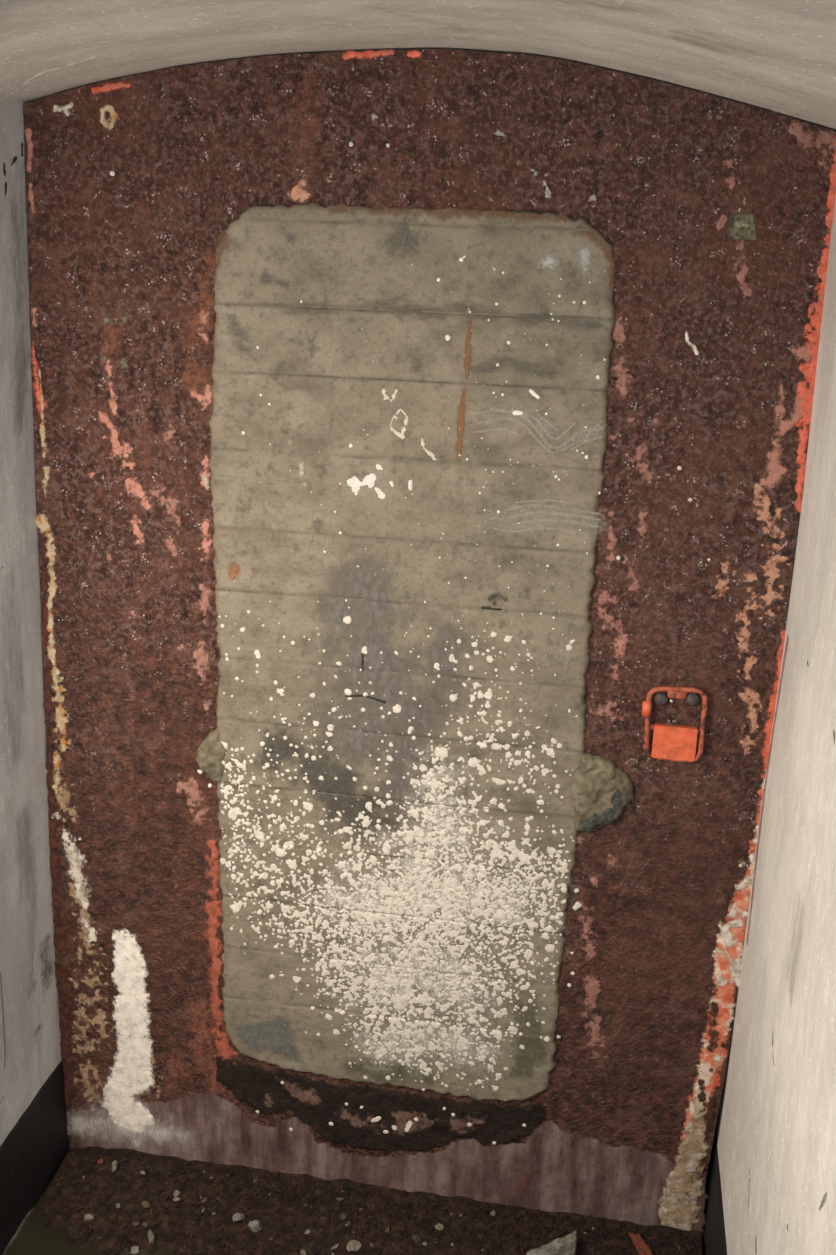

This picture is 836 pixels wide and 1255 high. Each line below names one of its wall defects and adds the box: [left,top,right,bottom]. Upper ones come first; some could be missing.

peeling [99,359,181,557]
rust [456,321,472,461]
peeling [712,121,836,680]
damp [35,514,71,795]
peeling [594,509,648,684]
rust [38,528,78,1134]
damp [51,812,97,943]
damp [72,929,187,1146]
damp [197,538,621,1101]
peeling [68,630,786,1237]
rust [697,1068,716,1132]
rust [706,1002,727,1052]